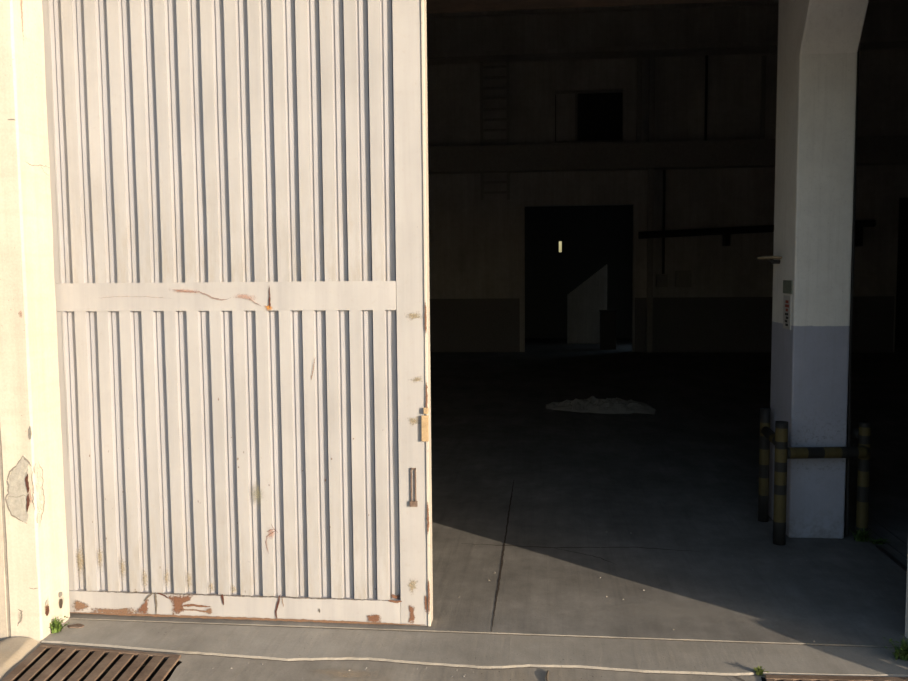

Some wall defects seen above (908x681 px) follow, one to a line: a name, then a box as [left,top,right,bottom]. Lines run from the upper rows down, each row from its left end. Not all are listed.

spalling [5,456,45,524]
rust [70,579,430,625]